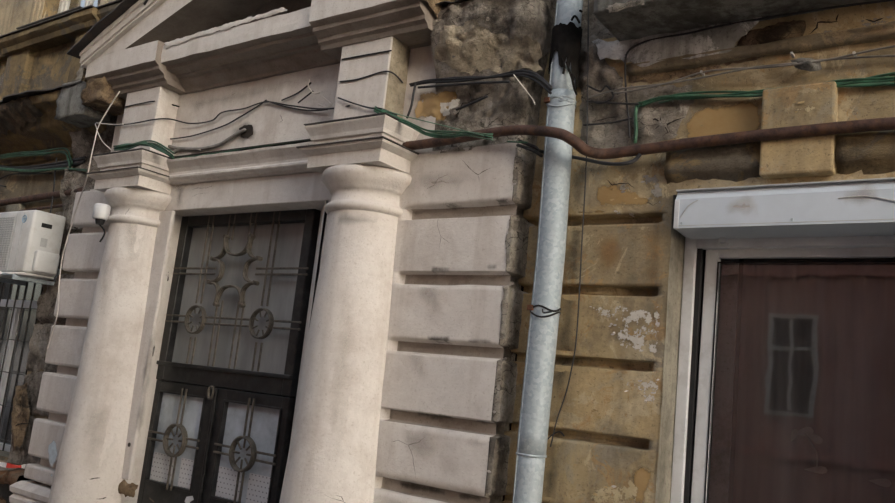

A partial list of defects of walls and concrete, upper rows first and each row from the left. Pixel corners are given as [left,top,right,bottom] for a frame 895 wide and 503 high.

spalling [606,0,645,13]
spalling [434,14,543,78]
spalling [737,20,806,46]
peeling [415,91,460,120]
spalling [578,35,760,148]
peeling [590,306,661,353]
spalling [11,383,30,452]
peeling [590,468,651,503]